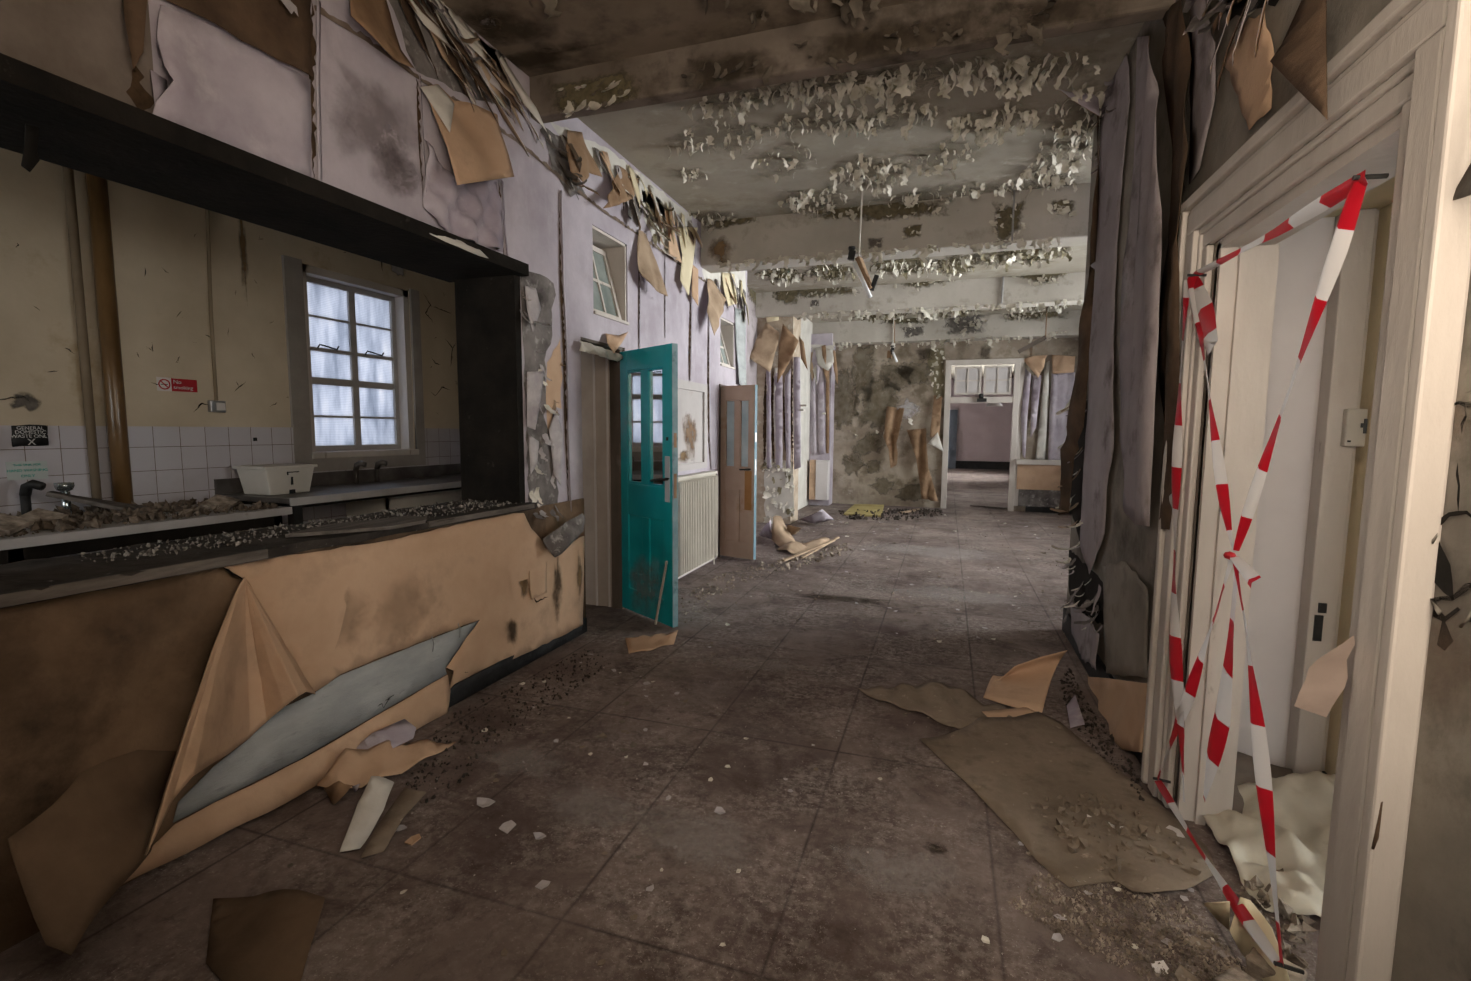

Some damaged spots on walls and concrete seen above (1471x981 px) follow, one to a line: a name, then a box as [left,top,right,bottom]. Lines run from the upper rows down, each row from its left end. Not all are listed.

peeling [7,271,585,956]
peeling [540,0,1328,753]
crack [1441,391,1471,525]
flaking render [1453,163,1471,200]